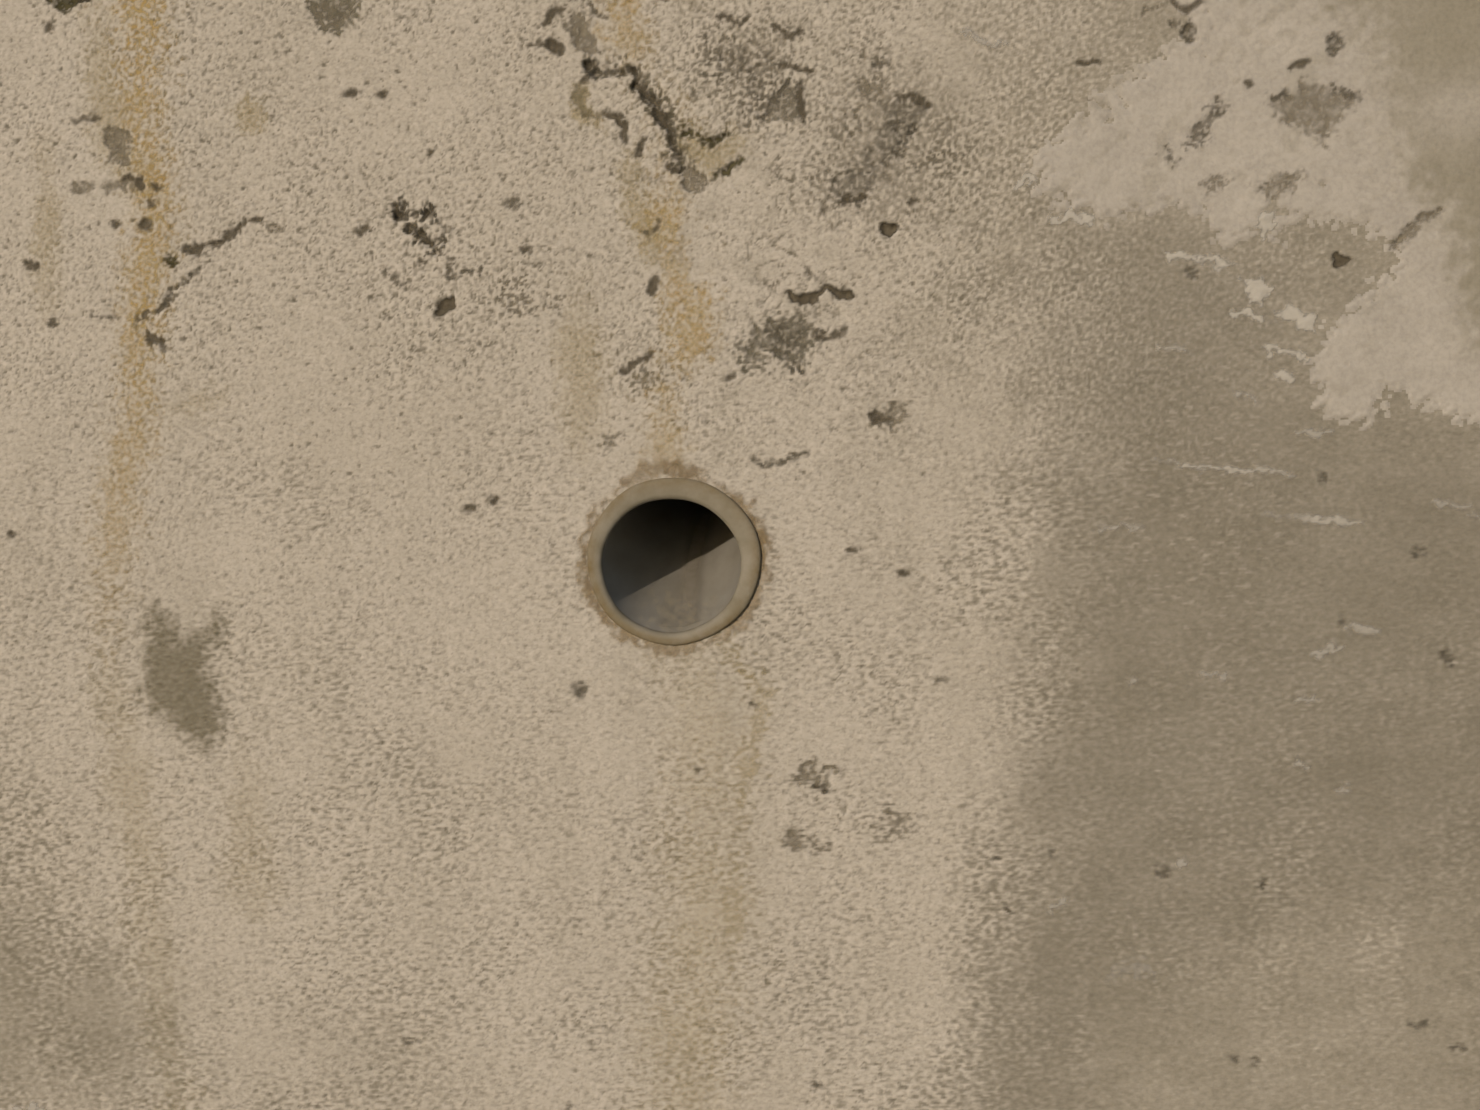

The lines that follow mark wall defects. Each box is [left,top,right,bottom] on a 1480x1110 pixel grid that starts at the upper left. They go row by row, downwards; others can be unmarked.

corrosion [120,0,168,346]
crack [581,58,744,193]
crack [108,218,280,349]
leakage [145,616,218,738]